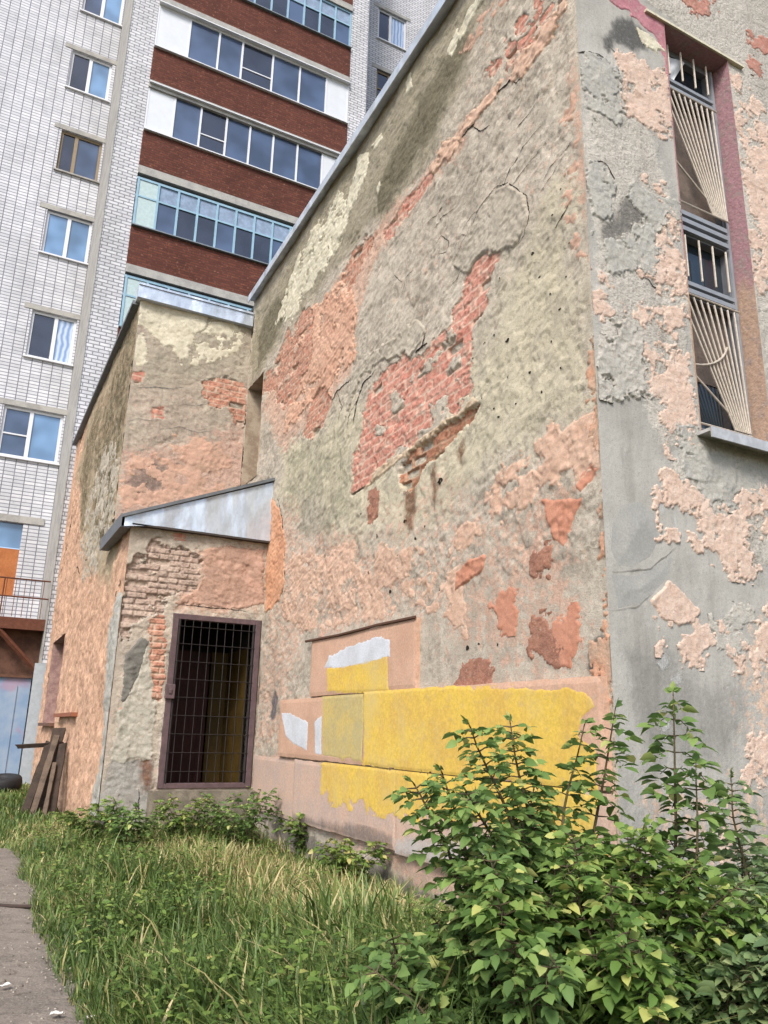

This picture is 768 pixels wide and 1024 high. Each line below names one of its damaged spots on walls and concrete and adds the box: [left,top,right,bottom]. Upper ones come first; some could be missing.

peeling [558,0,673,141]
leakage [605,18,645,51]
flaking render [262,0,568,524]
crack [429,106,571,287]
peeling [79,138,768,831]